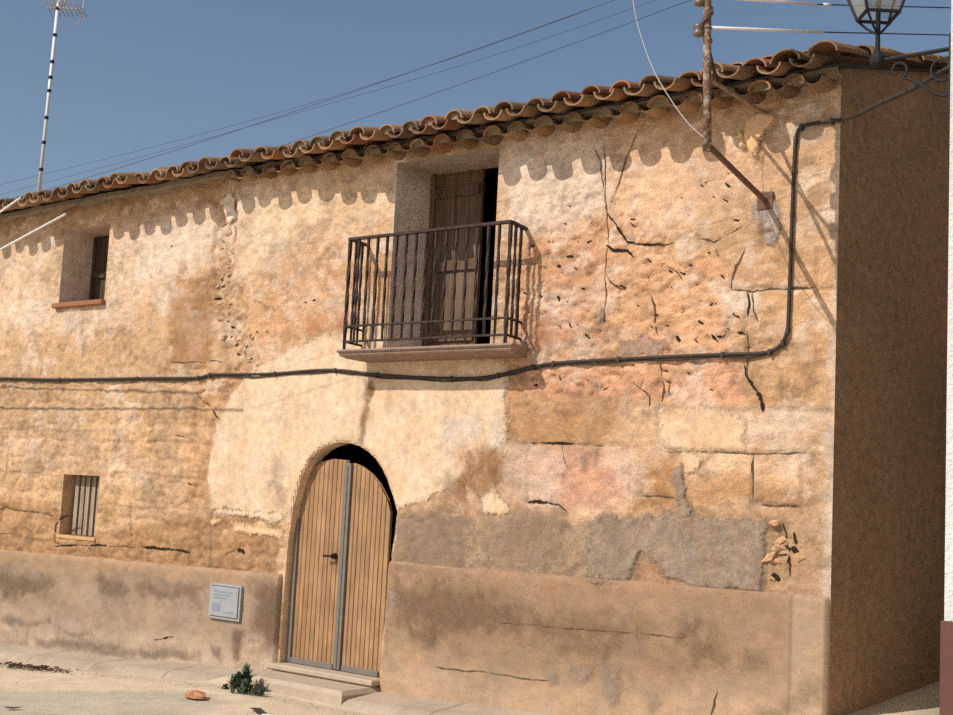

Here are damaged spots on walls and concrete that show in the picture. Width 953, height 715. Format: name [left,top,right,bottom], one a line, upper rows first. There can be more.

crack [594,131,681,324]
crack [650,295,658,333]
crack [700,226,817,412]
crack [632,365,670,407]
water stain [441,412,502,499]
crack [527,500,566,511]
crack [0,506,189,553]
spalling [762,520,805,581]
water stain [254,586,283,644]
water stain [232,631,240,658]
crack [438,667,546,681]